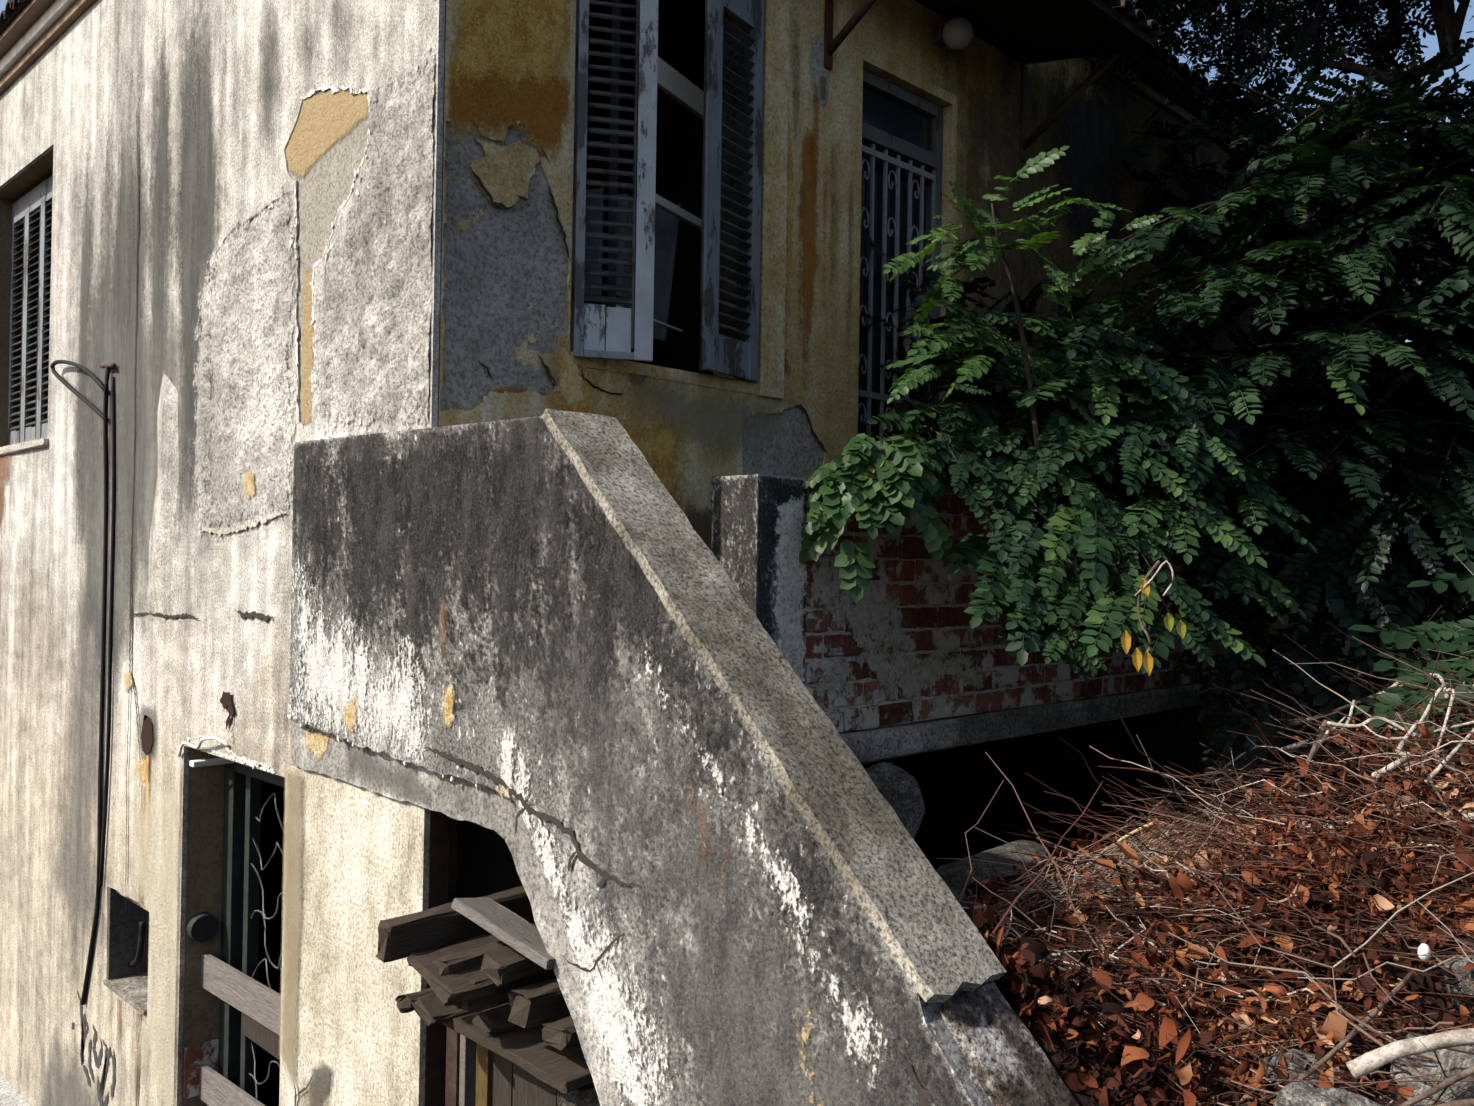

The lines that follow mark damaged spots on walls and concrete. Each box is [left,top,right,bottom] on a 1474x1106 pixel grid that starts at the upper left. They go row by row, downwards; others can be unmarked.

water stain [260,13,277,116]
flaking render [188,46,585,543]
corrosion [784,43,853,375]
water stain [55,37,224,948]
water stain [279,772,331,1106]
crack [424,747,642,887]
water stain [287,416,971,1106]
flaking render [771,495,986,706]